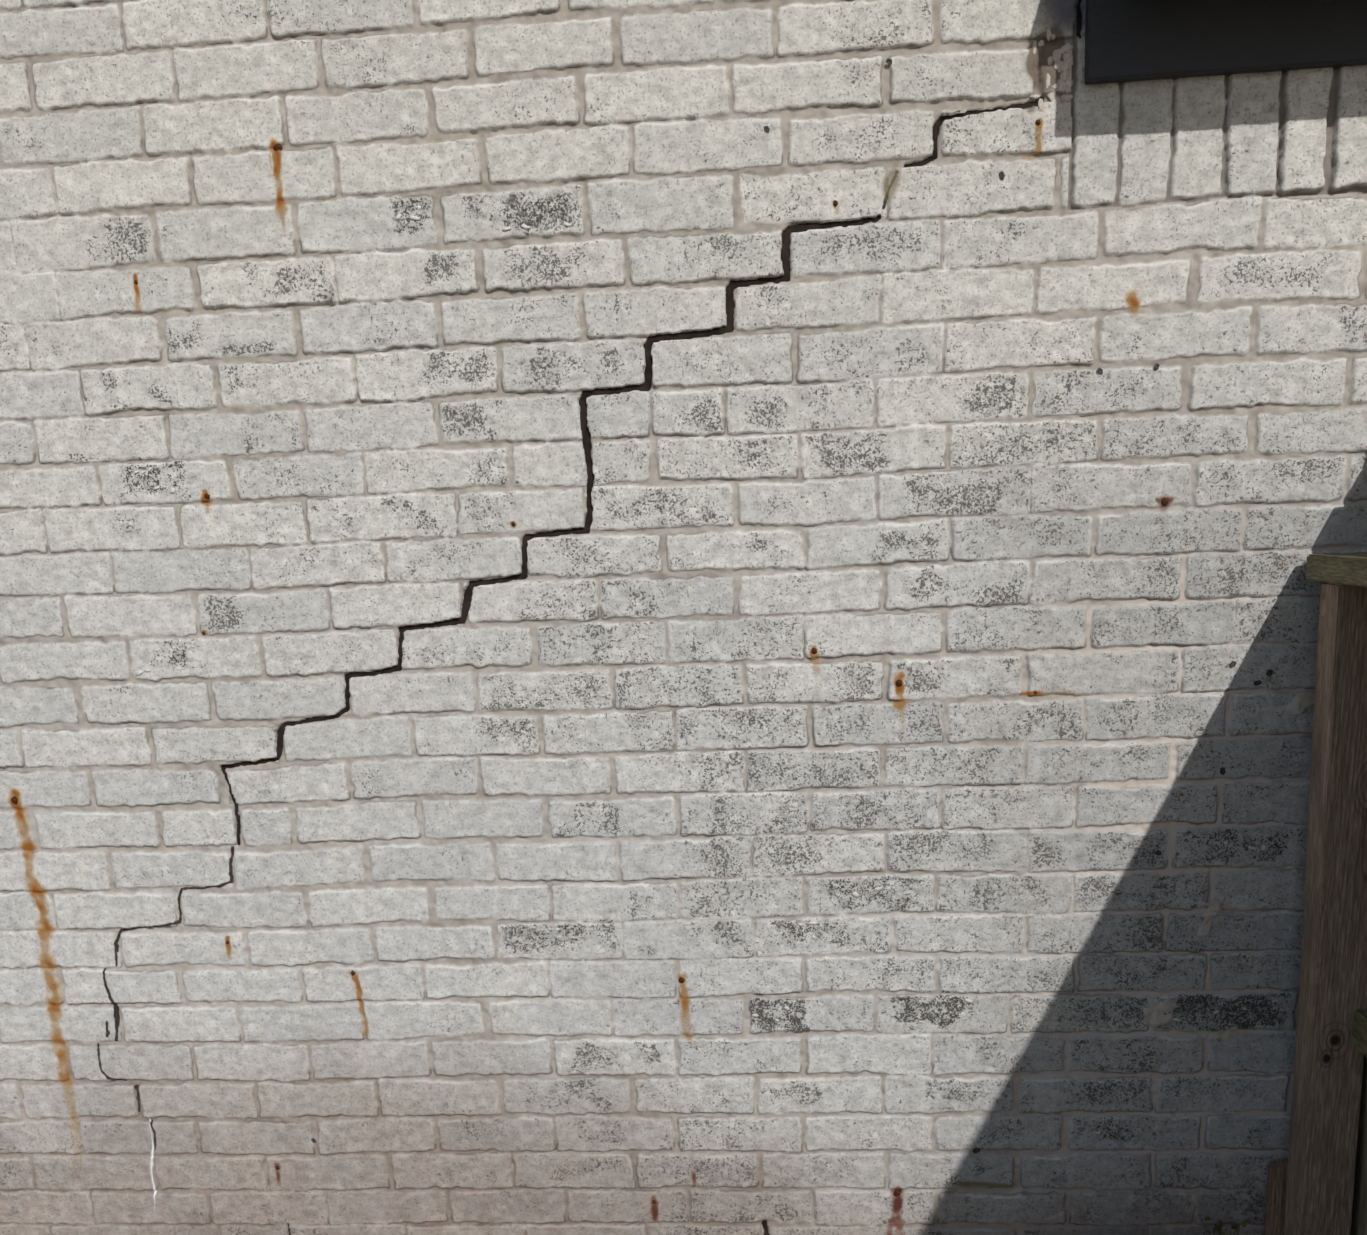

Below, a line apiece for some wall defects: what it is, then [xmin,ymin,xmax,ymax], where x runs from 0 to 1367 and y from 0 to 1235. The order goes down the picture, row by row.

crack [1075,0,1083,38]
spalling [1026,27,1073,112]
corrosion [1035,118,1043,155]
corrosion [270,140,286,220]
crack [97,97,1044,1210]
corrosion [894,673,907,709]
corrosion [9,789,71,1086]
corrosion [350,970,368,1035]
corrosion [678,975,691,1039]
corrosion [887,1187,903,1235]